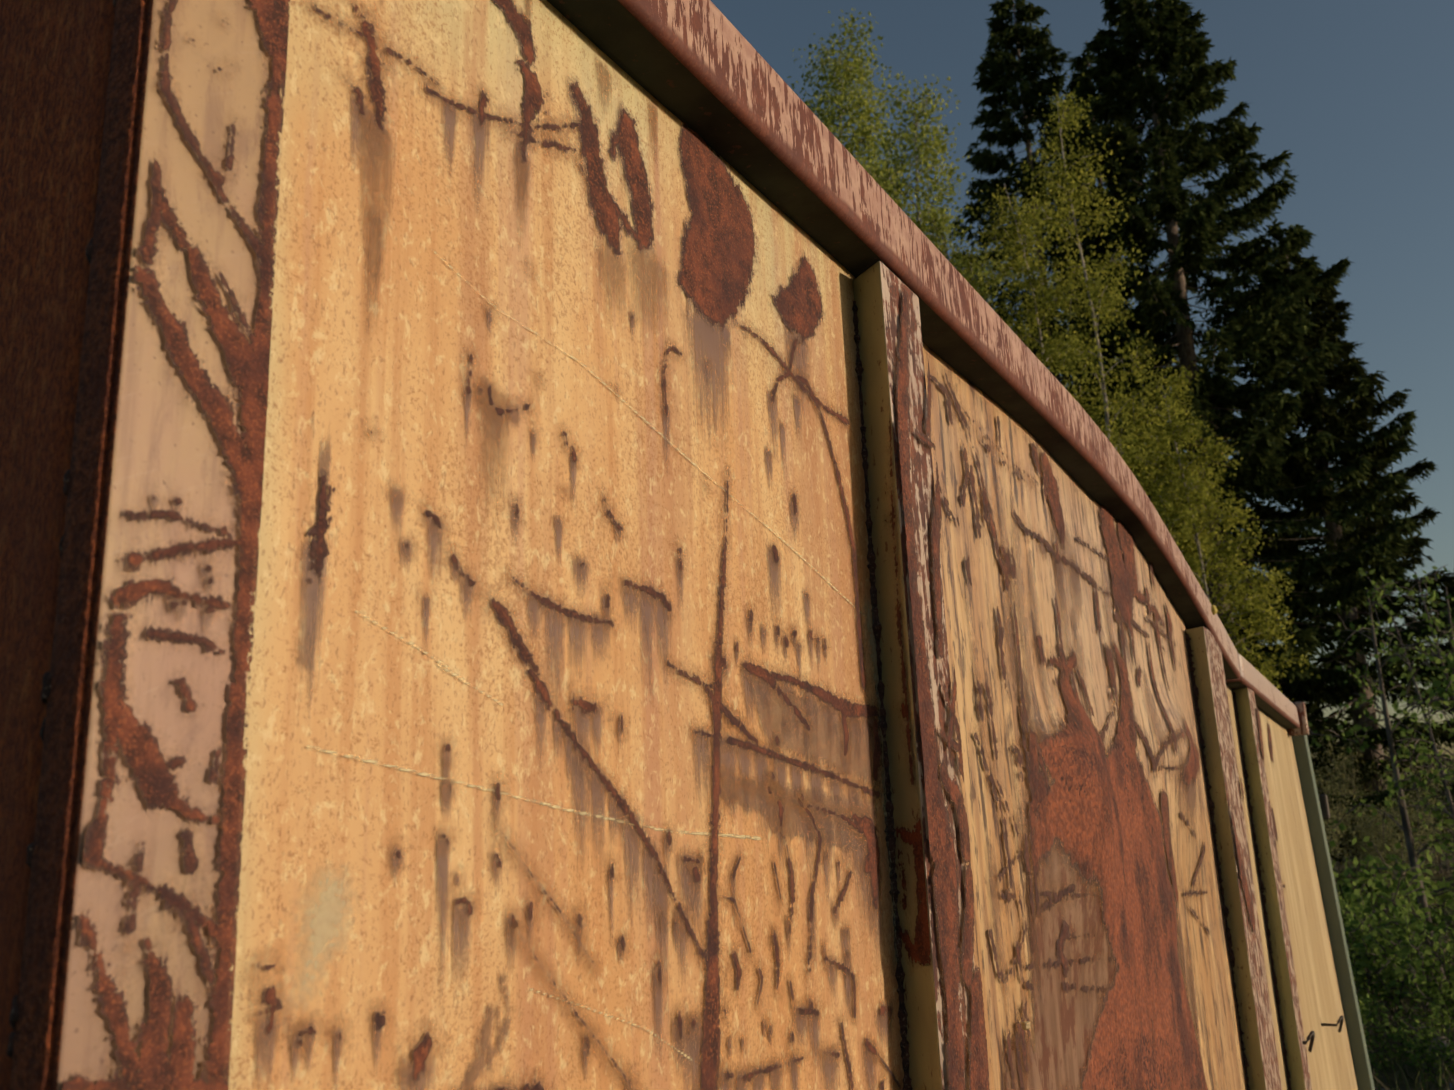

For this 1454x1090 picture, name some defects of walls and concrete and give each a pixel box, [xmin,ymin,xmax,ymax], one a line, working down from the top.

rust [133,158,271,517]
rust [351,4,387,154]
rust [568,81,658,256]
rust [676,121,757,425]
rust [765,252,824,480]
rust [84,495,245,867]
rust [303,470,335,665]
rust [694,593,881,936]
rust [915,360,990,1090]
rust [977,504,1208,1090]
rust [63,909,229,1090]
rust [718,998,820,1090]